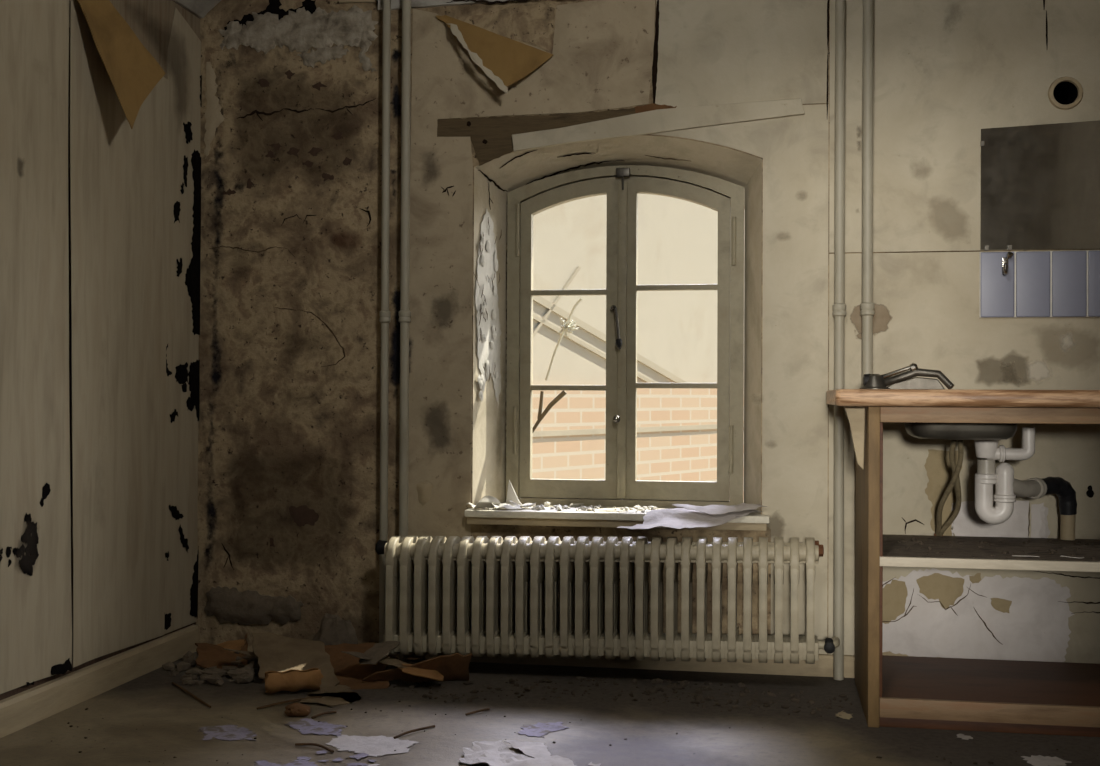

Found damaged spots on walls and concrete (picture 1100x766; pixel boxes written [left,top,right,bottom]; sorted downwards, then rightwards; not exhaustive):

crack [1041,0,1049,46]
water stain [392,85,401,117]
peeling [173,62,224,335]
water stain [214,141,243,264]
peeling [166,345,200,423]
water stain [211,325,221,390]
water stain [390,290,412,396]
peeling [473,208,502,405]
water stain [978,355,1050,383]
water stain [206,497,216,567]
flaking render [924,449,962,536]
peeling [882,568,1075,662]